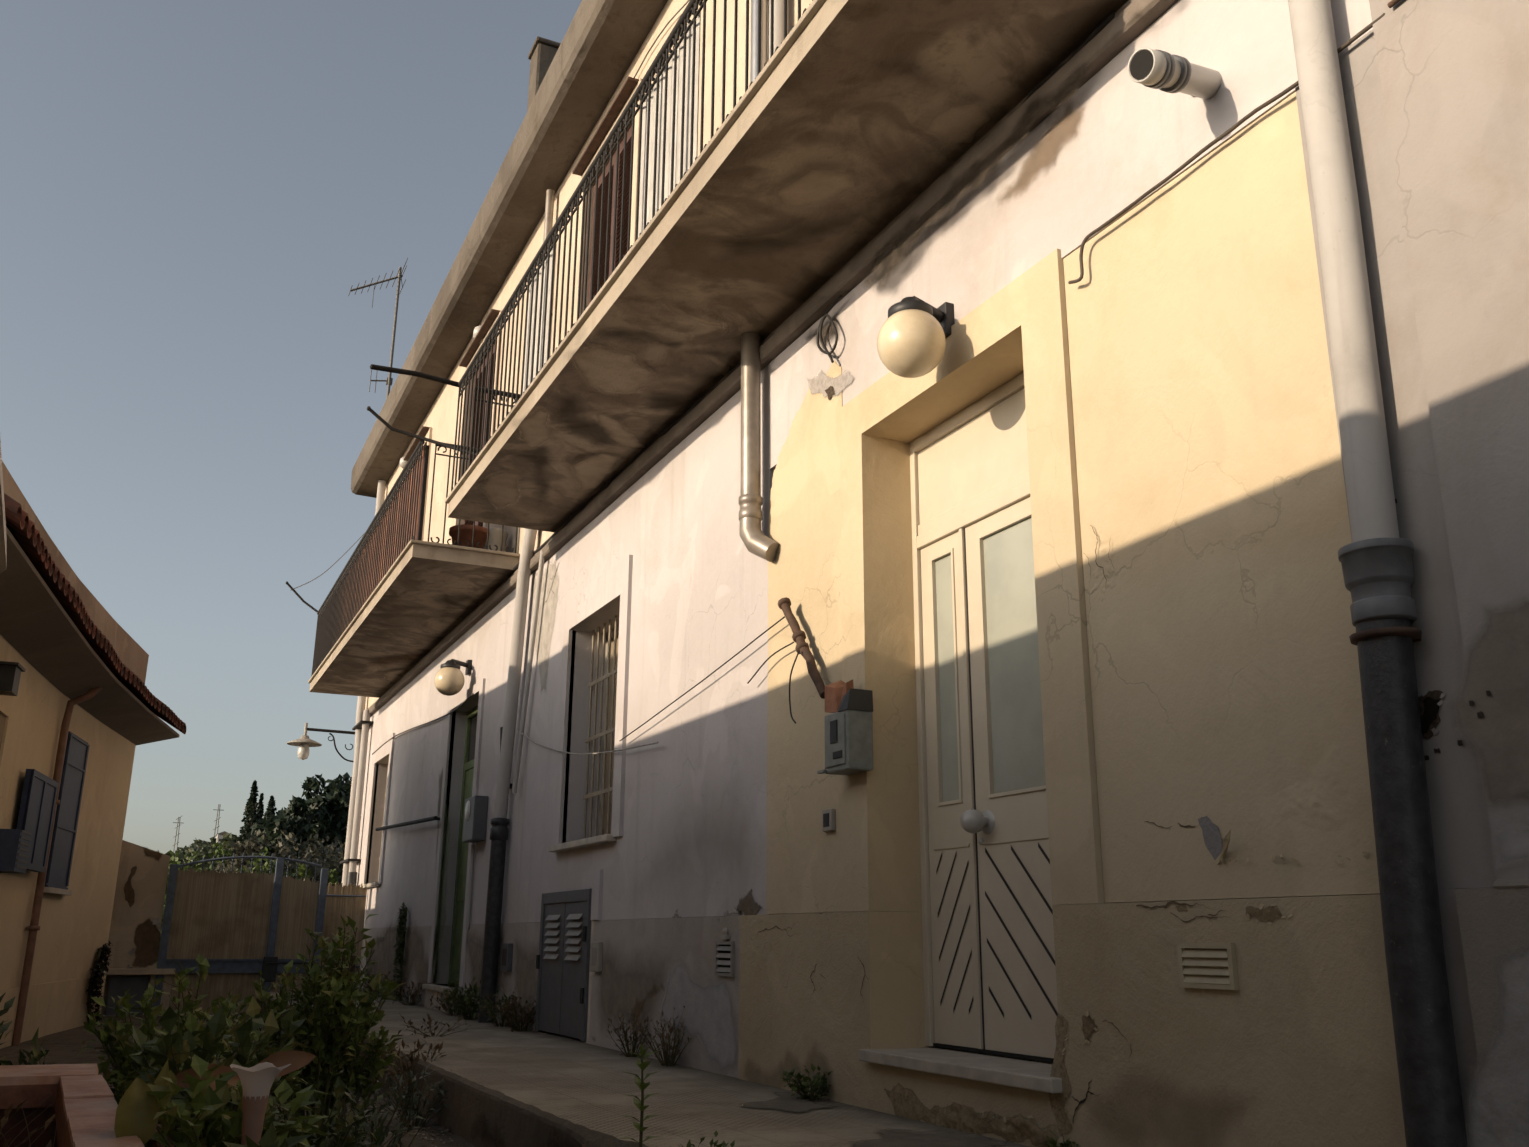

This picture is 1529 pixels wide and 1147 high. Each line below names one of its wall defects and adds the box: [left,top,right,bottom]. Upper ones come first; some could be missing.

damp [777,169,855,208]
damp [865,68,1085,286]
damp [808,320,837,344]
damp [519,333,651,492]
flaking render [1418,688,1446,760]
peeling [1198,816,1231,864]
flaking render [126,918,170,969]
flaking render [718,889,762,924]
flaking render [1246,903,1293,926]
flaking render [884,1010,1098,1147]
crack [1072,1016,1132,1122]
peeling [1468,949,1529,1147]